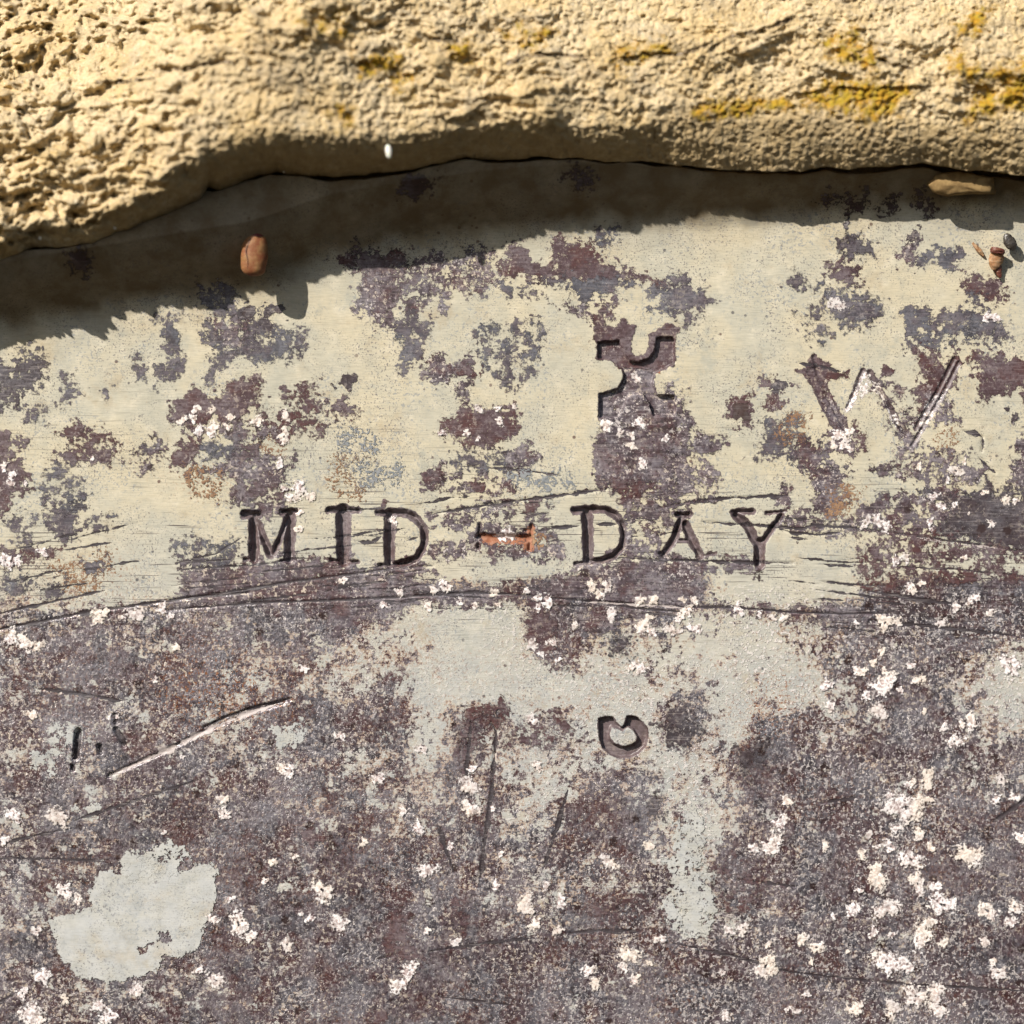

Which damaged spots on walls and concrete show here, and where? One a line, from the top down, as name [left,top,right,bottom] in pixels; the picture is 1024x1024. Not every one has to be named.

peeling [0,276,364,607]
peeling [315,215,1024,677]
corrosion [481,524,553,552]
corrosion [381,902,433,964]
corrosion [578,891,652,931]
corrosion [708,851,775,920]